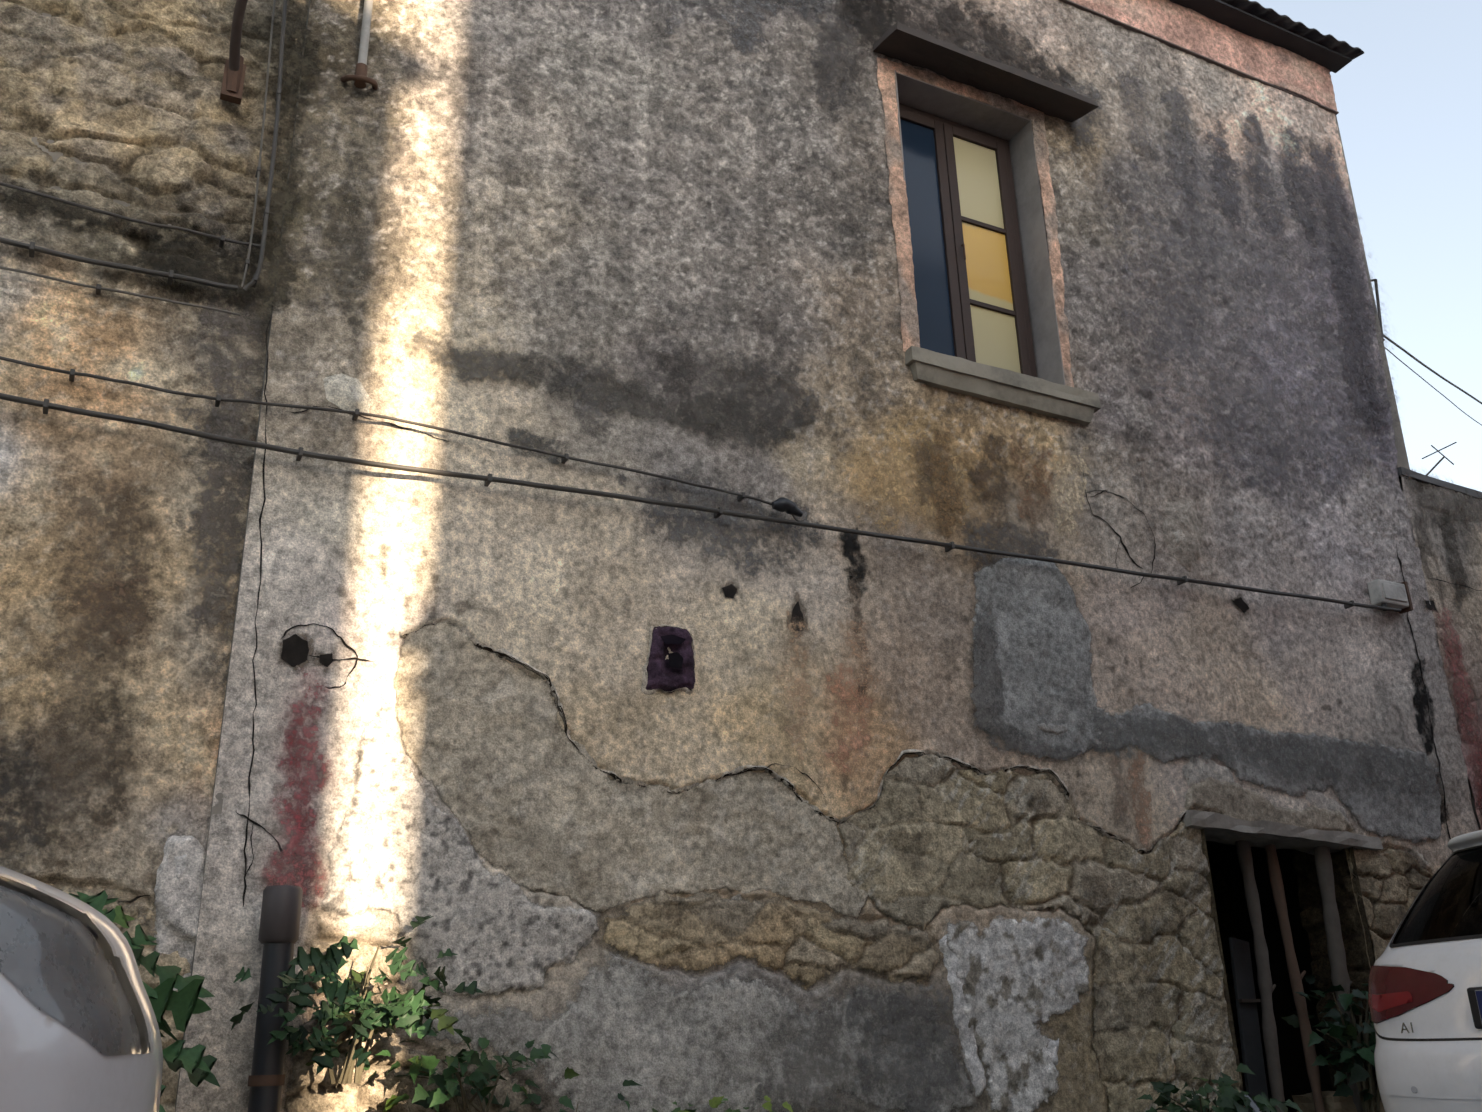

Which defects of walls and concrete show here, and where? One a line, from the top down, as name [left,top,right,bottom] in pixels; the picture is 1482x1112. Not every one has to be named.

damp [665,0,1103,152]
damp [0,1,322,703]
damp [405,330,821,449]
damp [1108,70,1399,502]
damp [1407,469,1482,612]
damp [0,481,170,873]
rust [264,673,331,908]
flaking render [284,916,541,1112]
flaking render [394,619,1353,1112]
flaking render [1348,846,1433,960]